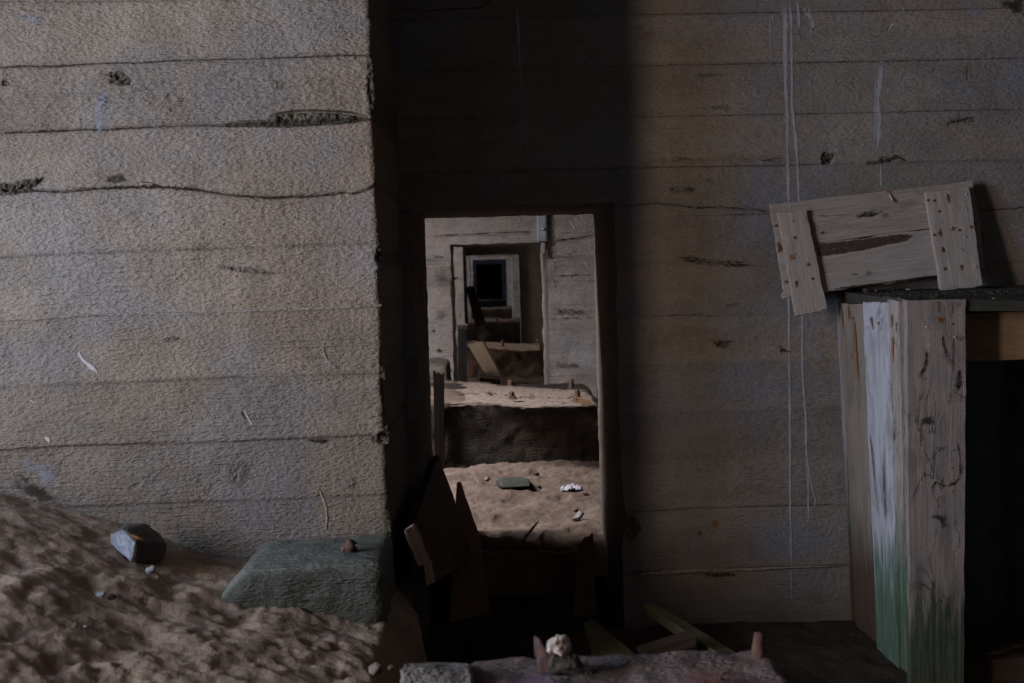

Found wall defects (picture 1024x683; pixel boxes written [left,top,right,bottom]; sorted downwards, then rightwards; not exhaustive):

spalling [216,57,375,128]
leakage [720,1,814,202]
leakage [874,65,883,148]
spalling [0,177,43,195]
crack [7,182,373,200]
leakage [787,297,818,602]